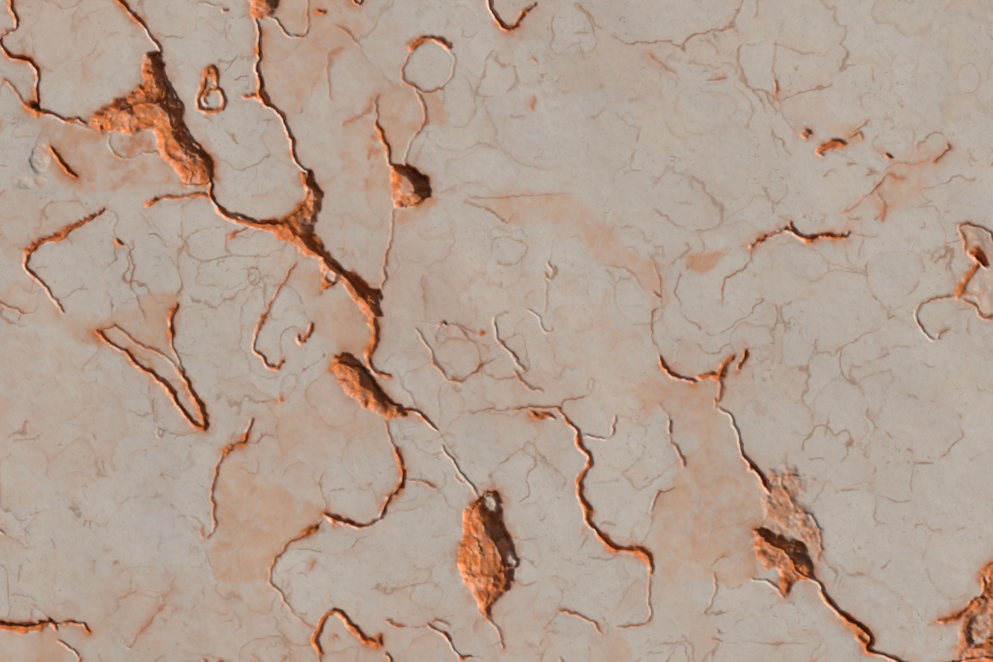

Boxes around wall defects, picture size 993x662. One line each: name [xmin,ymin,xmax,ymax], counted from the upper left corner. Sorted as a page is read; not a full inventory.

spalling [81,40,230,195]
spalling [380,153,443,222]
crack [471,0,550,119]
crack [719,20,979,309]
crack [0,0,459,662]
spalling [319,339,409,422]
crack [178,210,819,662]
crack [911,292,956,344]
spalling [949,213,993,329]
spalling [449,479,524,620]
spalling [738,462,828,605]
crack [749,571,993,662]